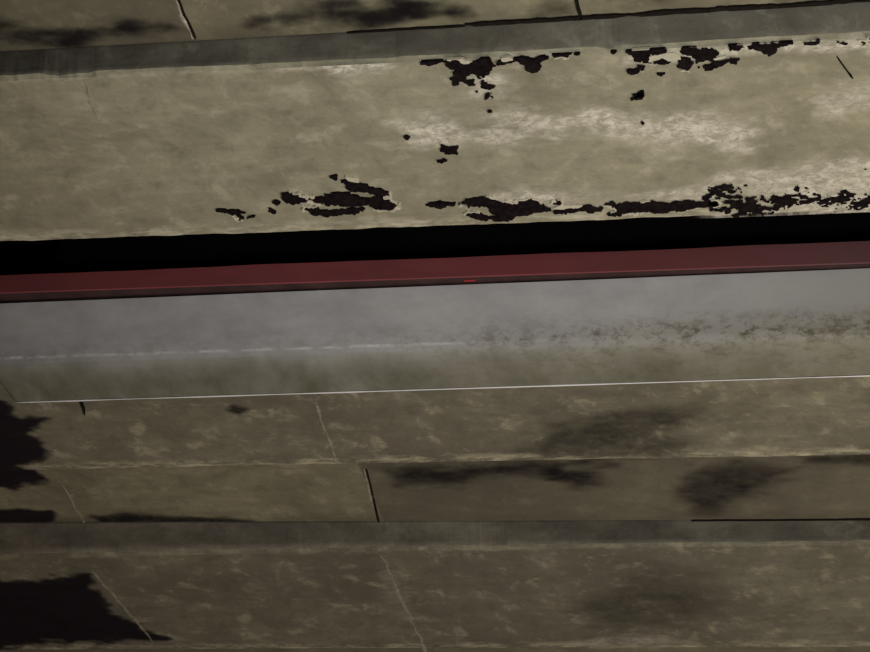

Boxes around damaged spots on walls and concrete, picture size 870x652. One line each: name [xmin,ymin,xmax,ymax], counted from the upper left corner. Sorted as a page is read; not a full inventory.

crack [178,0,196,40]
crack [347,0,870,34]
peeling [420,52,580,113]
peeling [610,40,793,77]
crack [837,56,853,79]
peeling [437,143,459,164]
peeling [216,208,255,222]
peeling [268,174,401,218]
peeling [425,183,870,222]
leakage [0,401,47,490]
leakage [0,509,55,523]
leakage [0,574,171,650]